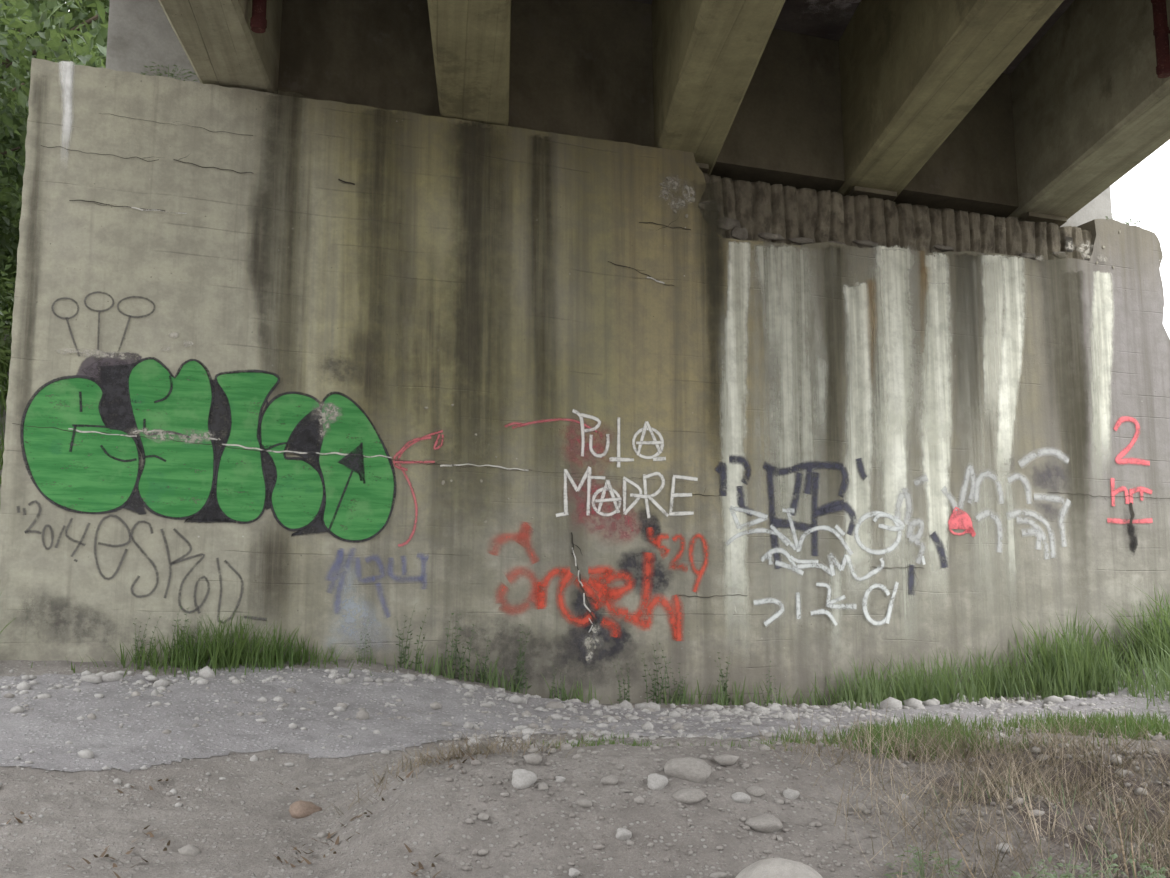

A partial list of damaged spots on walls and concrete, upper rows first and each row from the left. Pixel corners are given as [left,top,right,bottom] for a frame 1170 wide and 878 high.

damp [254,92,298,290]
damp [327,110,389,397]
crack [12,423,722,496]
damp [454,123,495,447]
damp [532,136,550,303]
damp [705,182,1024,628]
spalling [659,172,1114,269]
damp [1050,252,1113,496]
damp [262,541,282,595]
crack [571,532,598,652]